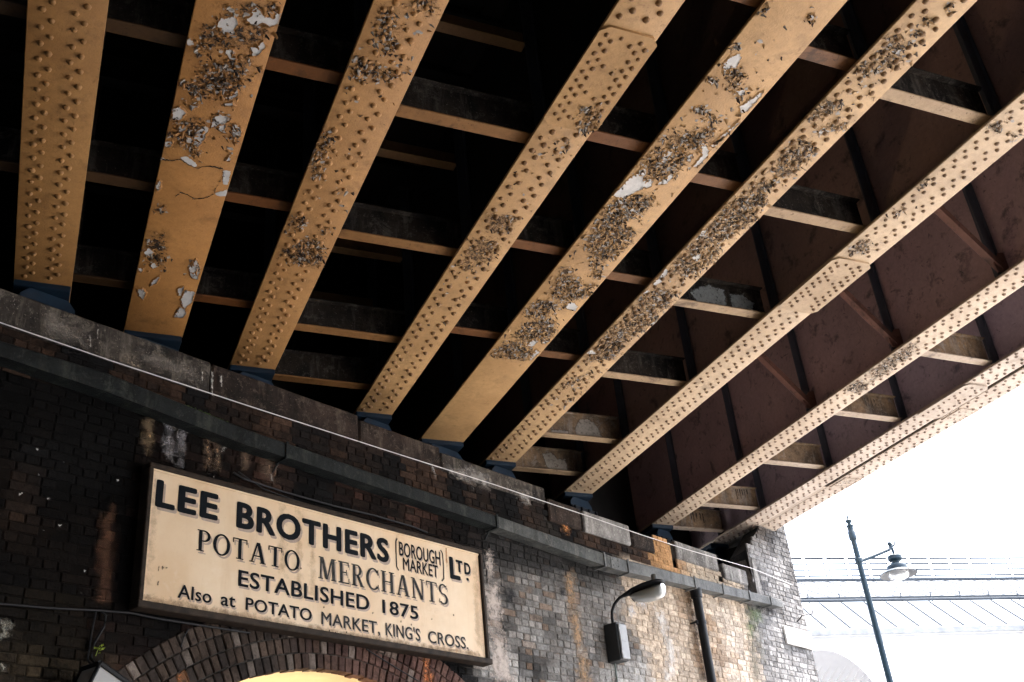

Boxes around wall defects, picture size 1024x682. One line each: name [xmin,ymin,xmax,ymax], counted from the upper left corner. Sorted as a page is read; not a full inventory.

peeling [164,0,284,163]
peeling [344,0,441,103]
peeling [804,7,818,27]
peeling [135,230,173,301]
peeling [173,258,202,318]
crack [160,157,231,200]
peeling [278,214,336,269]
peeling [308,130,365,214]
peeling [427,171,534,327]
peeling [489,39,782,367]
peeling [545,16,935,410]
water stain [143,421,186,463]